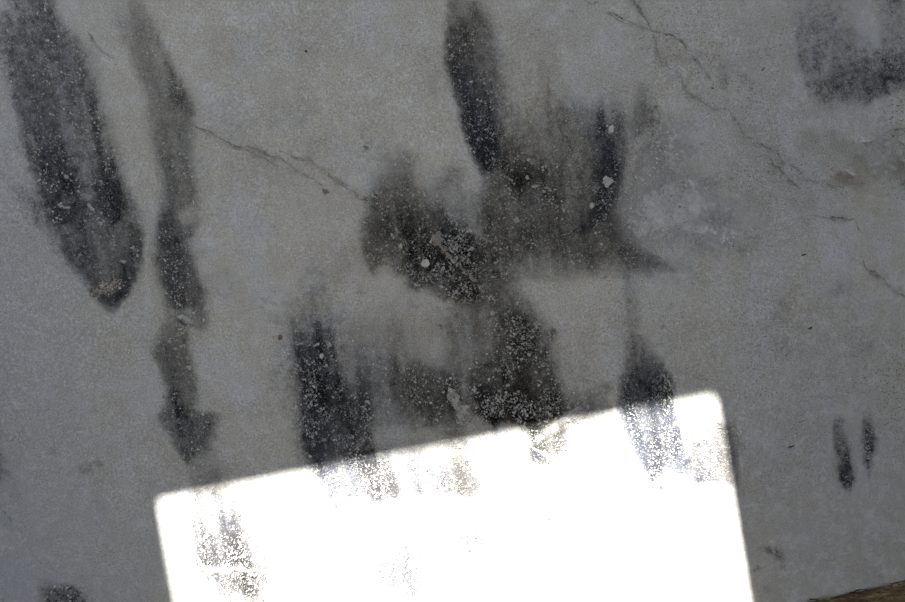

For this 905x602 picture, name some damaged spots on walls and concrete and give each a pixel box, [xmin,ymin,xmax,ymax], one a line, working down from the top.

leakage [0,0,141,310]
leakage [145,71,276,602]
leakage [285,4,739,568]
leakage [834,417,874,486]